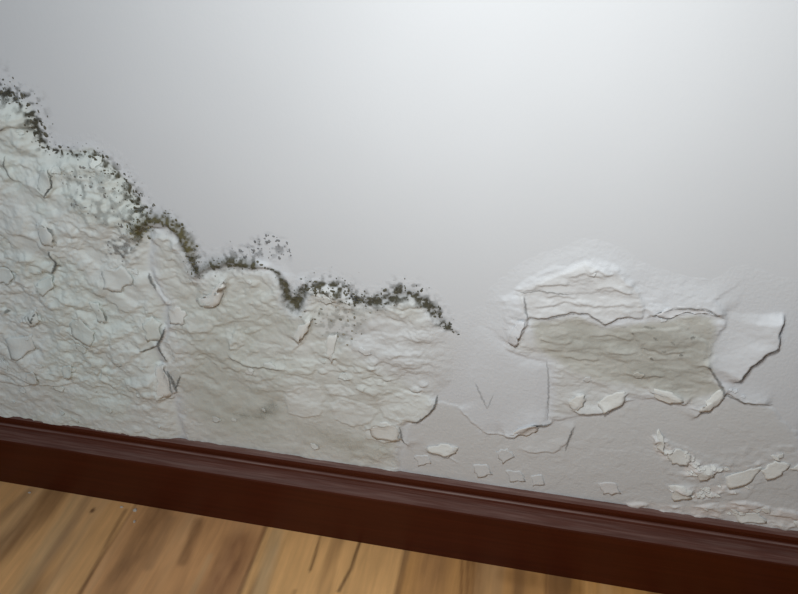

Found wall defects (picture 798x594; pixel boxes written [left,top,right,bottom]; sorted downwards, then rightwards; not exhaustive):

crack [143,330,180,390]
leakage [0,77,460,346]
flaking render [0,72,798,531]